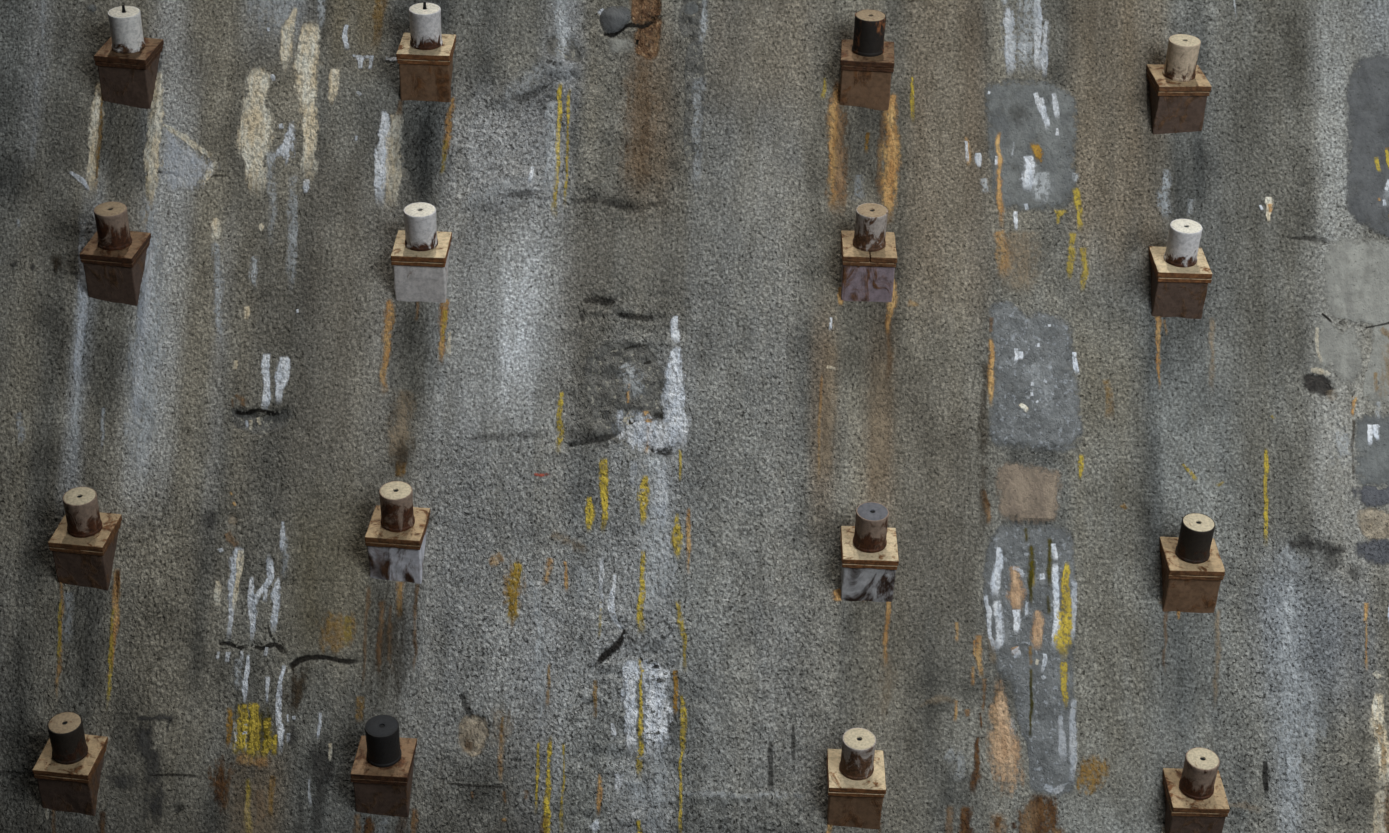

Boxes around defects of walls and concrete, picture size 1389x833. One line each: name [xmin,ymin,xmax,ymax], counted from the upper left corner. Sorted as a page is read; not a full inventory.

leakage [342,25,397,68]
leakage [237,0,340,272]
leakage [374,112,403,196]
spalling [230,394,293,435]
spalling [584,342,671,455]
leakage [214,522,287,634]
leakage [216,647,296,756]
crack [220,625,354,708]
rust [955,636,1023,793]
leakage [1369,671,1389,781]
rust [959,807,973,833]
rust [991,796,1062,833]